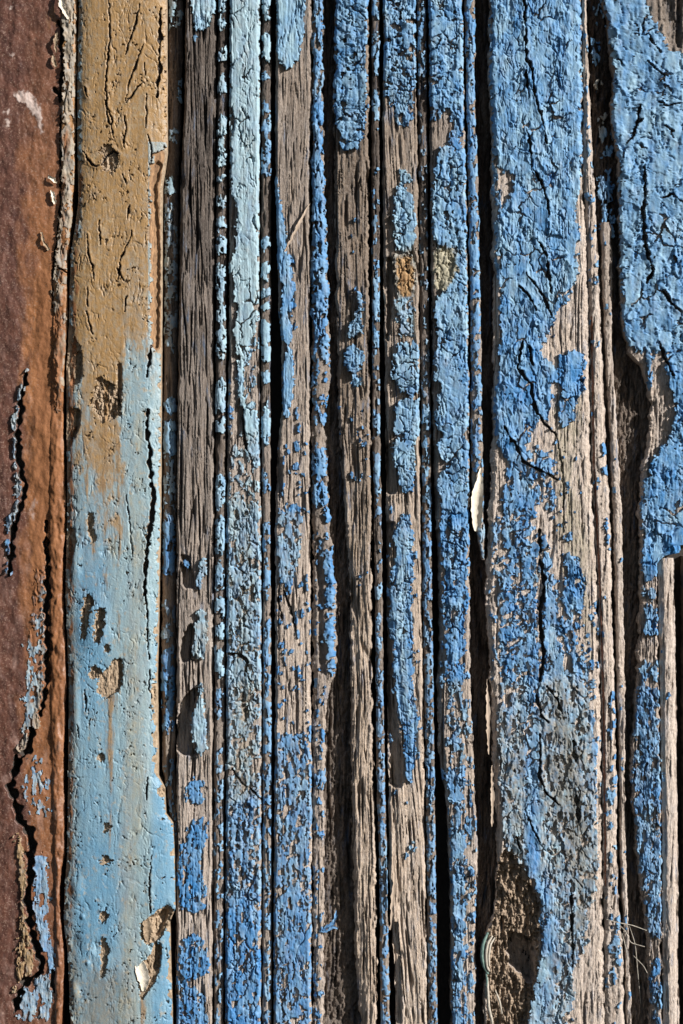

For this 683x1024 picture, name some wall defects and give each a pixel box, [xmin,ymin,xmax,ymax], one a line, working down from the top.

crack [51,1,164,334]
crack [518,238,553,316]
crack [522,0,550,215]
crack [626,101,680,144]
crack [640,166,683,313]
peeling [5,384,25,576]
peeling [16,576,53,817]
rust [26,172,88,764]
peeling [40,0,337,1024]
peeling [333,0,683,1024]
crack [503,340,581,823]
peeling [12,832,56,1022]